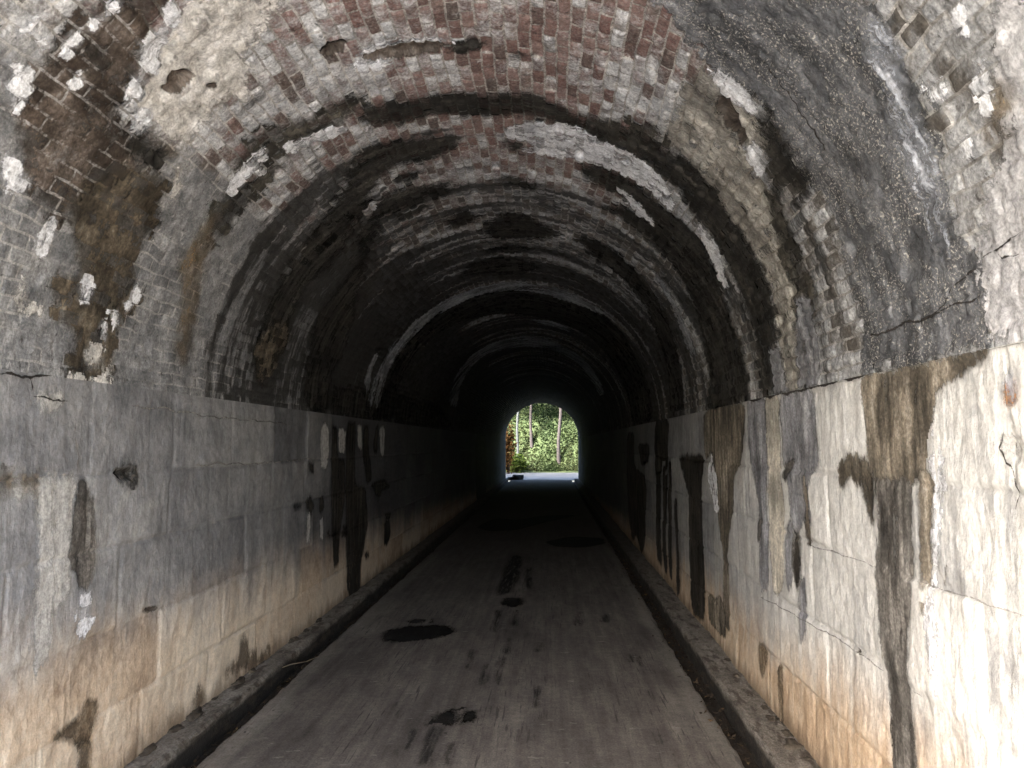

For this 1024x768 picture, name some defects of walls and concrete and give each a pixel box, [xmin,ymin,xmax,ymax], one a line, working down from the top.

spalling [161,68,195,94]
spalling [320,39,347,57]
spalling [353,37,455,73]
damp [282,125,347,154]
damp [505,121,675,227]
damp [46,165,183,384]
crack [870,233,1019,337]
crack [2,371,65,402]
damp [627,65,820,640]
damp [837,0,1024,768]
crack [999,432,1020,512]
damp [11,475,96,674]